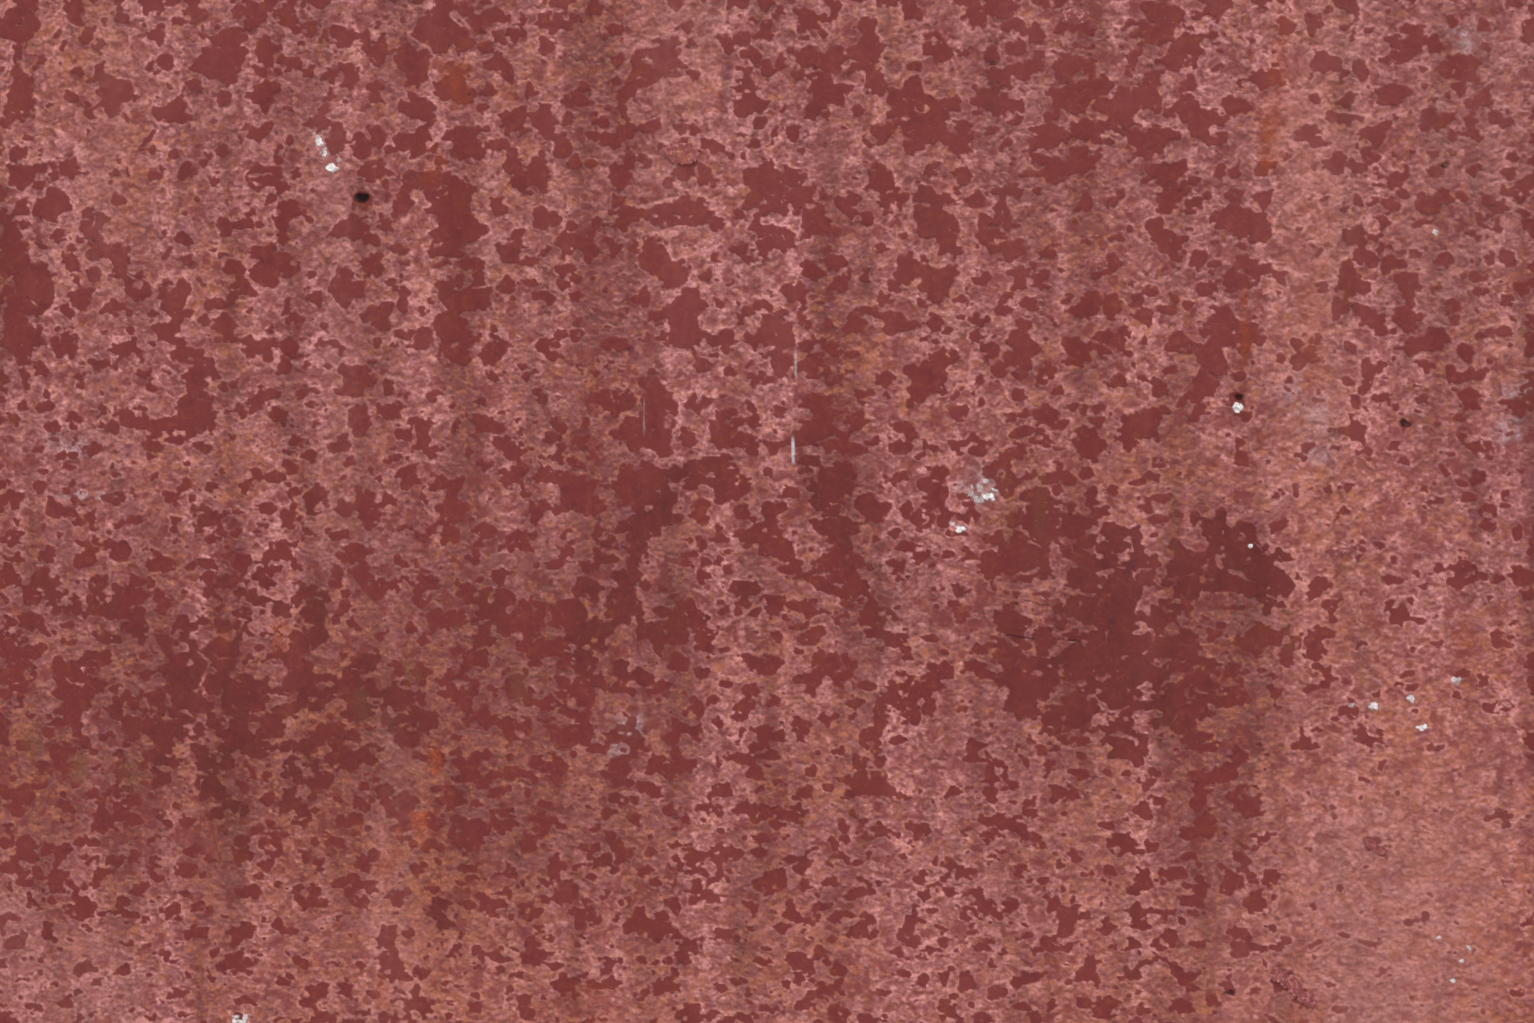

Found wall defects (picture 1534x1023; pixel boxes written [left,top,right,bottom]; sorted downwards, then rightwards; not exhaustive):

spalling [315,136,338,172]
spalling [971,479,998,502]